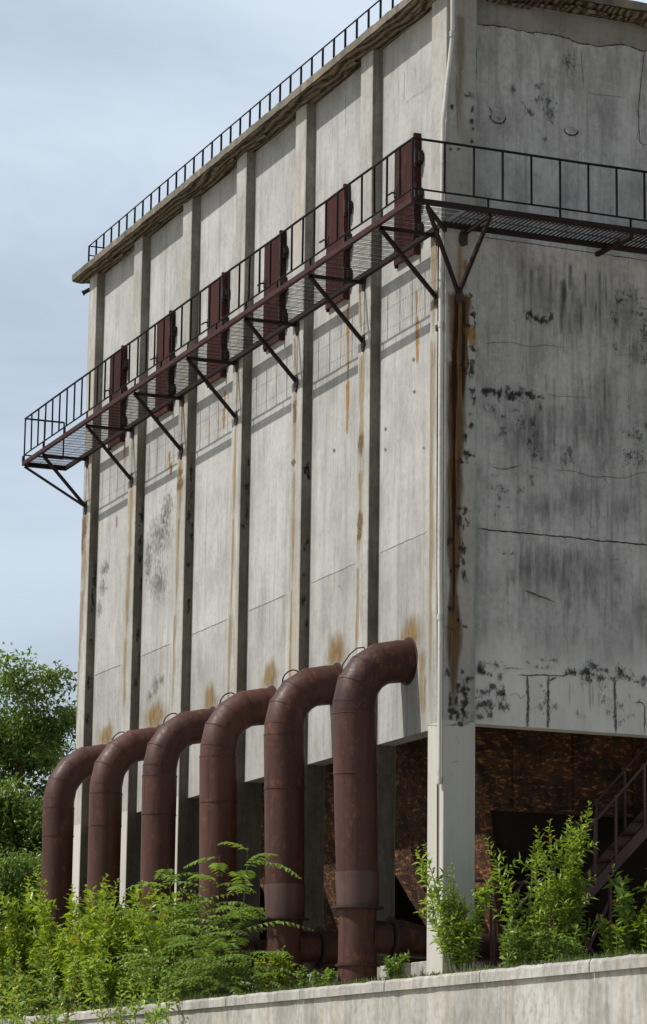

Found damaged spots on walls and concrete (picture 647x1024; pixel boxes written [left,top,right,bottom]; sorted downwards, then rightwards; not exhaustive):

crack [476,24,647,145]
corrosion [346,291,362,431]
mould [459,347,544,464]
corrosion [448,247,475,695]
crack [480,528,647,568]